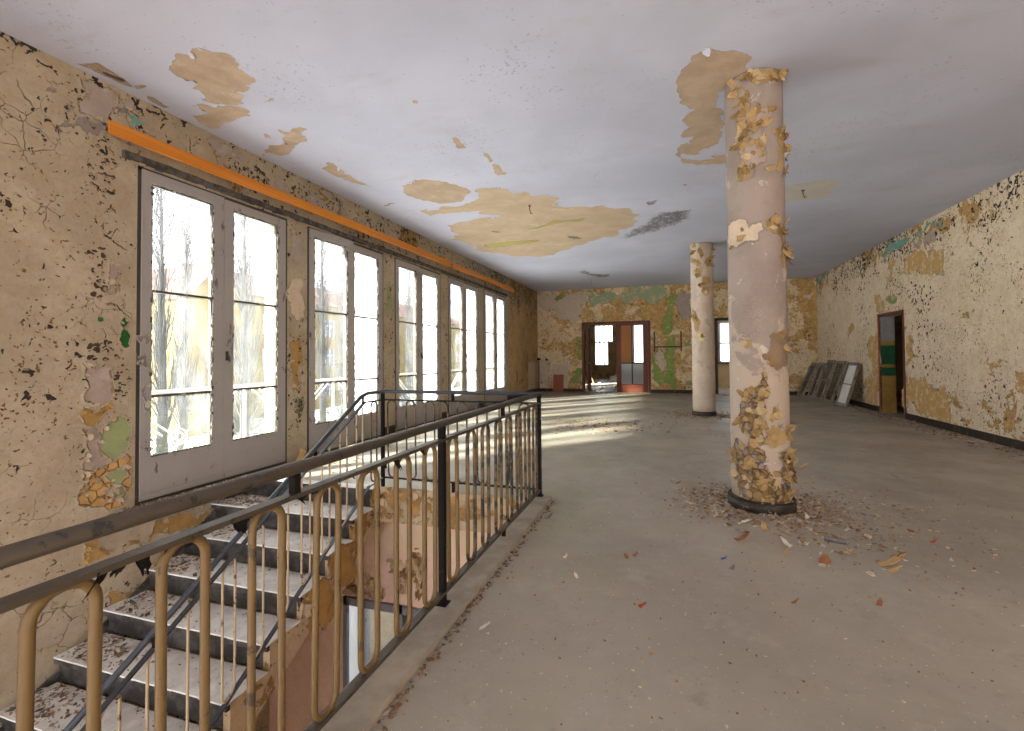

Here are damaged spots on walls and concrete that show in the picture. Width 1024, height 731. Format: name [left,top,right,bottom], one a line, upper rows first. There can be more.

peeling [87,247,123,302]
peeling [74,316,154,512]
peeling [166,46,258,129]
peeling [228,126,341,215]
peeling [400,151,641,284]
peeling [528,336,585,390]
mould [626,211,687,237]
peeling [651,212,794,390]
peeling [674,47,792,184]
peeling [727,330,798,555]
peeling [815,217,953,424]
peeling [300,542,428,634]